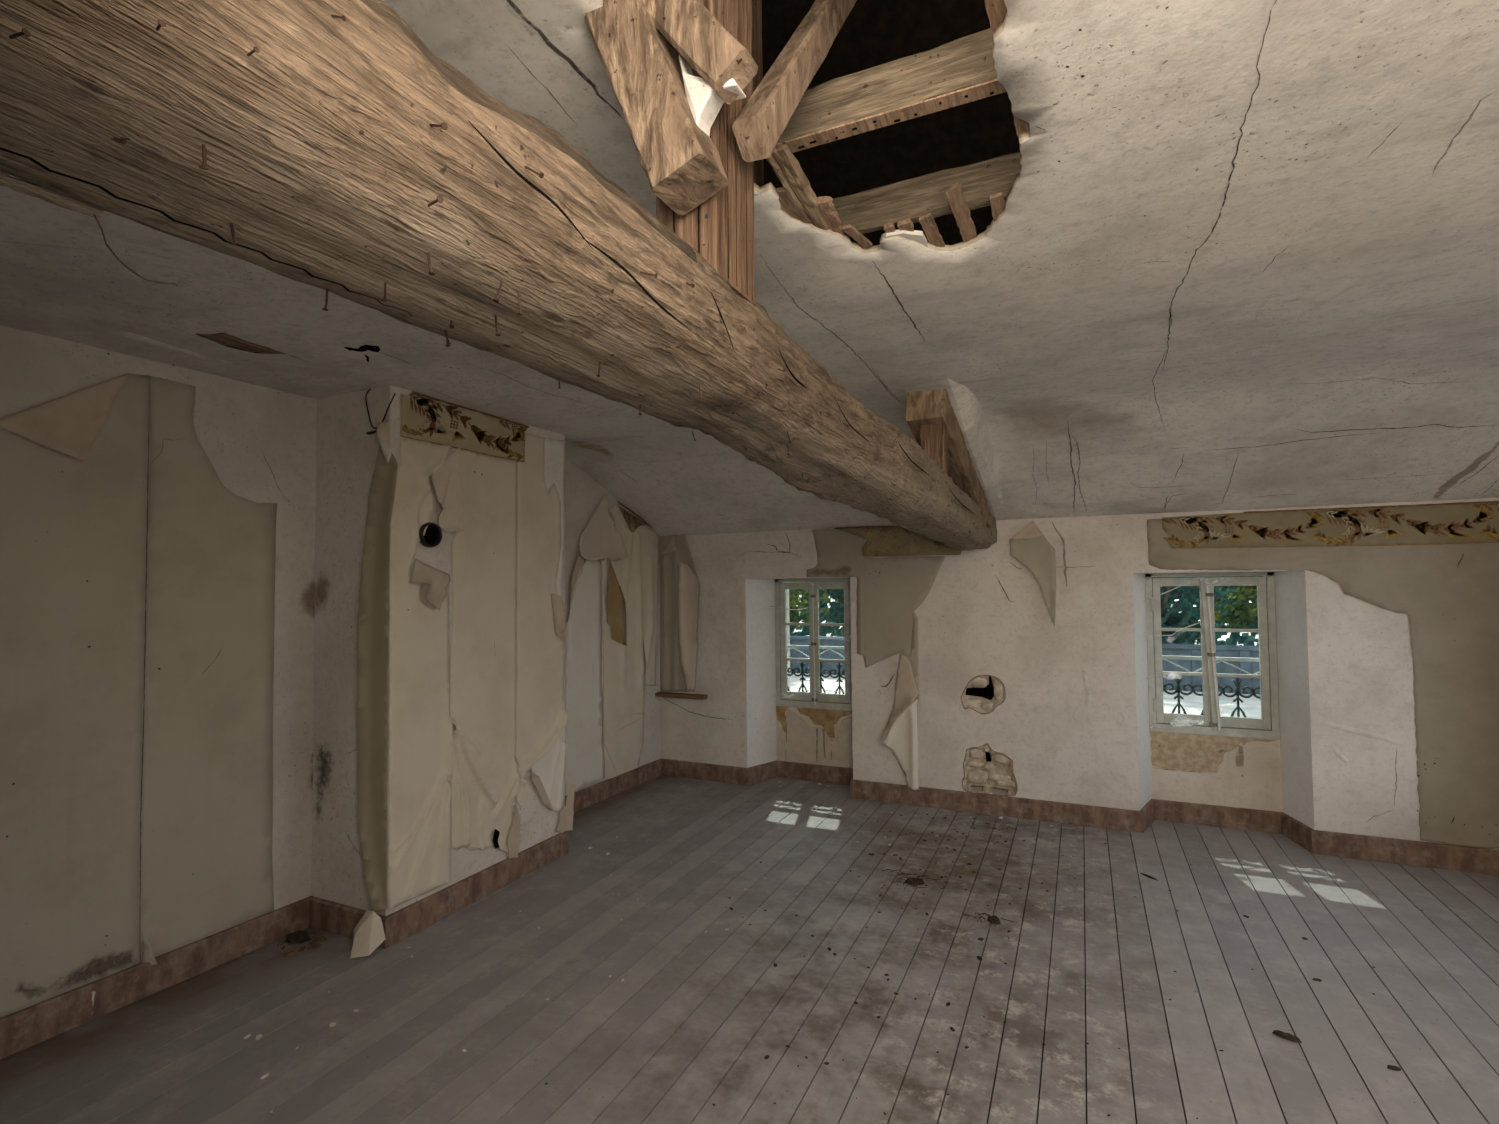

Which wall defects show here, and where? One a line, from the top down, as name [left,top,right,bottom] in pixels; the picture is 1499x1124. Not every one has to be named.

crack [507,0,623,119]
crack [1129,0,1490,509]
crack [1032,422,1087,514]
hole [961,674,1006,715]
spalling [961,743,1018,796]